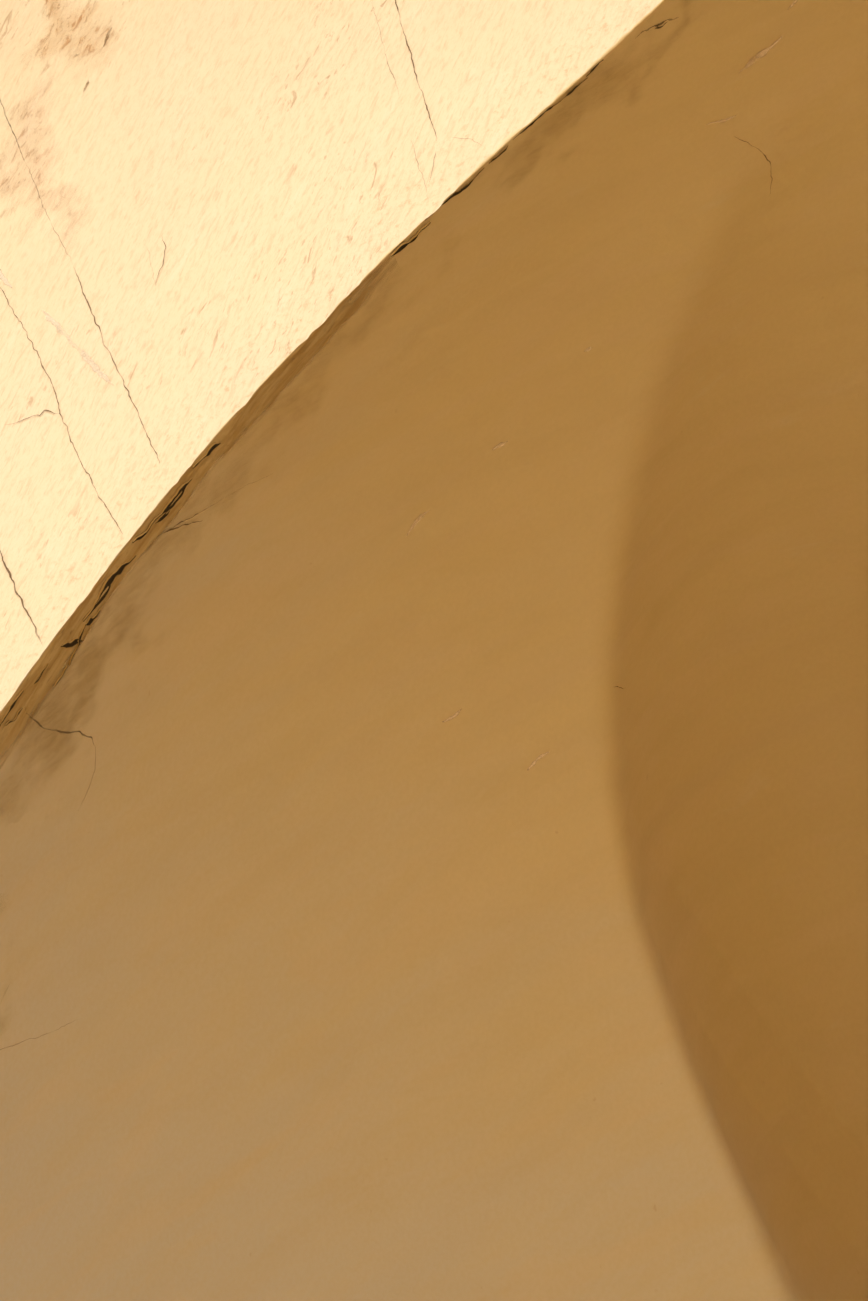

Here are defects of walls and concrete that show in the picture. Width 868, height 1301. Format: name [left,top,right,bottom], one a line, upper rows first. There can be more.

crack [395,0,436,135]
crack [2,290,121,531]
crack [77,275,160,463]
spalling [0,59,603,757]
crack [0,551,36,632]
crack [26,713,96,794]